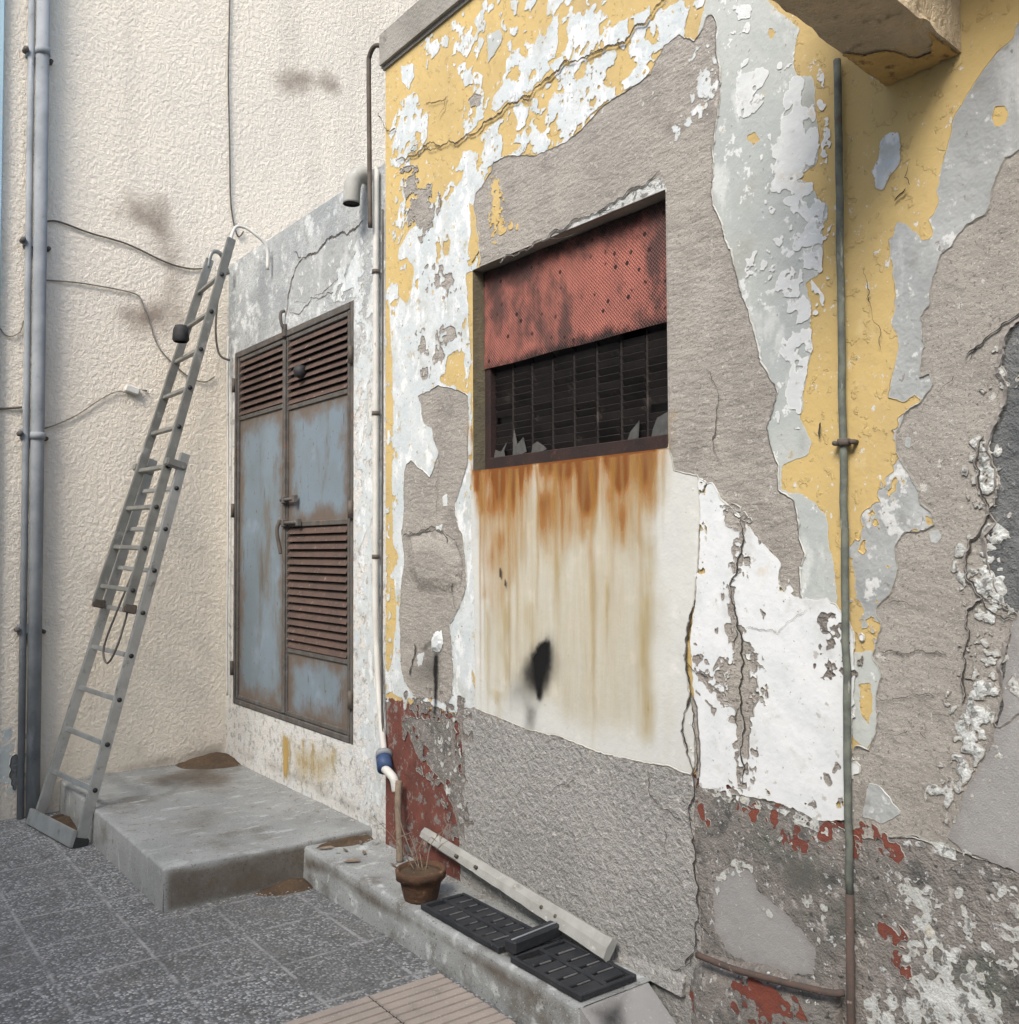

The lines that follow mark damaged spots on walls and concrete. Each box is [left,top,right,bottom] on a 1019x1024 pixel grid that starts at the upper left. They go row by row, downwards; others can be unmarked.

crack [378,0,664,161]
crack [286,221,362,315]
crack [939,313,1019,391]
corrosion [471,449,659,567]
flaking render [316,0,1019,1024]
crack [879,435,1015,703]